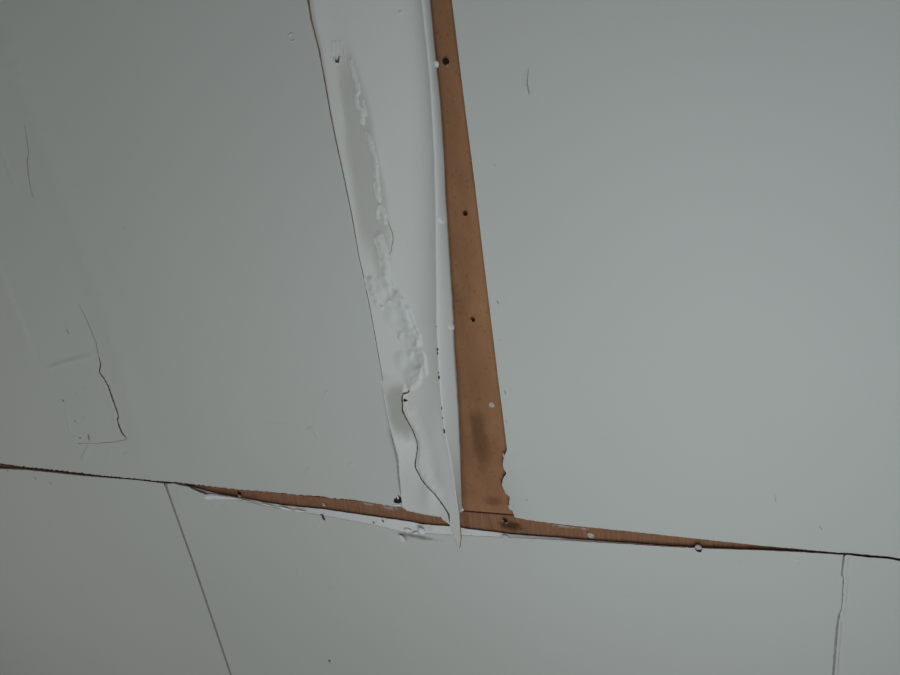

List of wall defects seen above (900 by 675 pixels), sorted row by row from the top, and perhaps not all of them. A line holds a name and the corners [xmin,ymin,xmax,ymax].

peeling [309,0,463,549]
crack [78,303,127,444]
peeling [203,494,306,512]
crack [832,557,845,675]